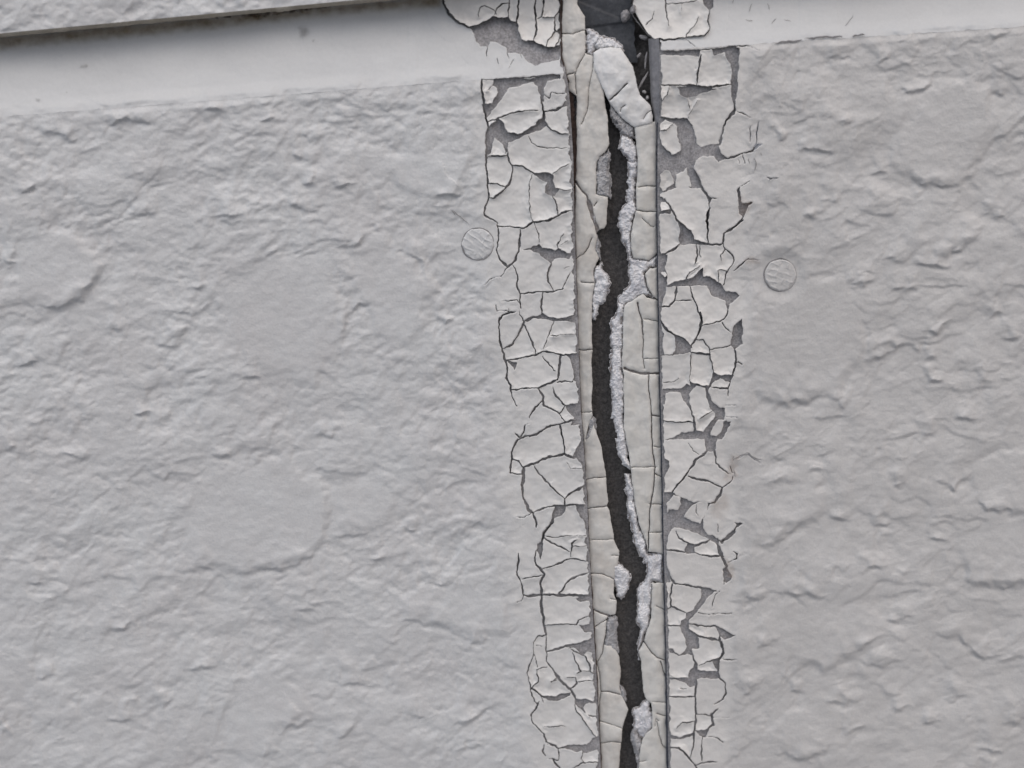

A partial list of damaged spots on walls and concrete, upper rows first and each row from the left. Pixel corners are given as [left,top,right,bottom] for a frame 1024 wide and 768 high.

peeling [442,0,601,768]
crack [560,0,669,768]
peeling [629,0,759,768]